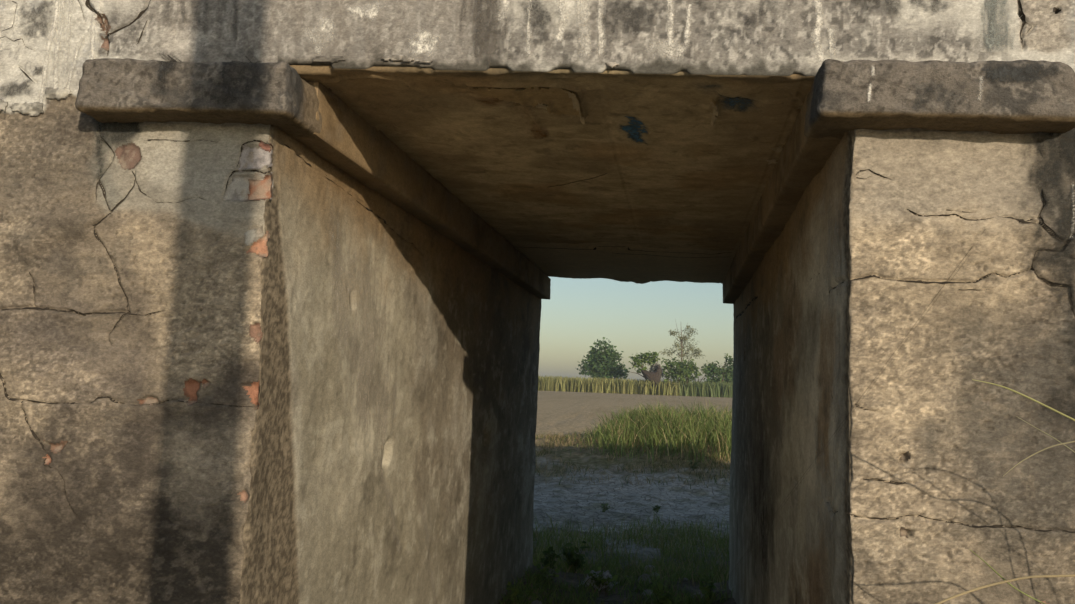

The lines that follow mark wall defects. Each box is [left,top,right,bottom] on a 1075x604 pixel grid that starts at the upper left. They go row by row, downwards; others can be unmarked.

crack [78,0,151,55]
efflorescence [555,0,604,55]
efflorescence [651,0,691,58]
efflorescence [813,0,835,61]
damp [984,0,1009,50]
crack [1018,0,1032,49]
spalling [115,142,142,170]
flaking render [223,140,274,202]
flaking render [244,226,270,258]
flaking render [242,380,260,410]
crack [708,190,1075,604]
crack [0,373,251,536]